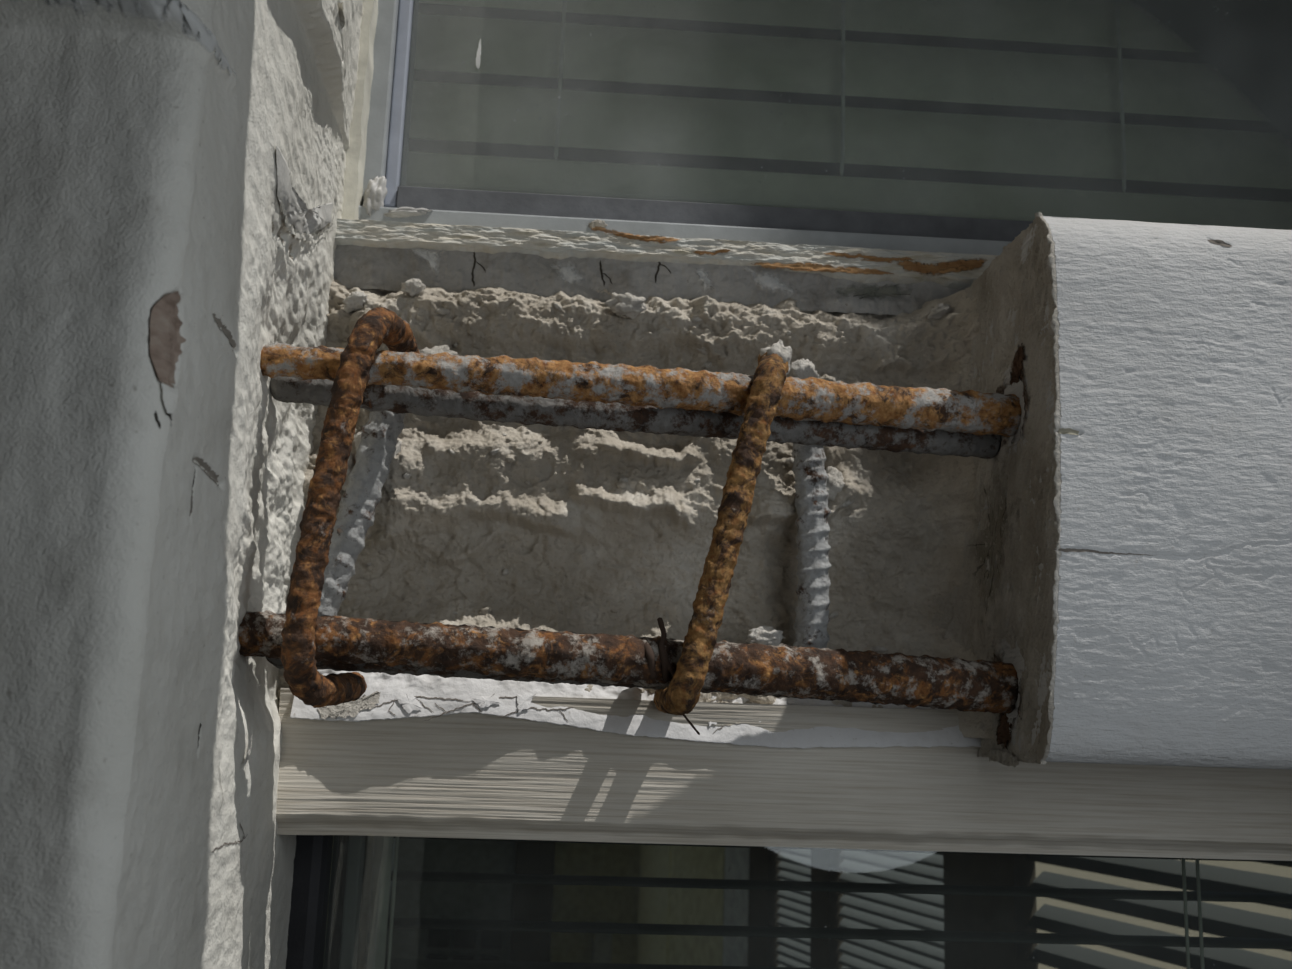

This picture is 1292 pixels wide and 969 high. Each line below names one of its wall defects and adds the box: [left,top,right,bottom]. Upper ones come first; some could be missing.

corrosion [591,226,680,244]
corrosion [754,251,986,275]
spalling [149,291,186,414]
corrosion [996,343,1029,444]
spalling [260,278,1022,739]
crack [1054,548,1152,556]
spalling [238,610,289,703]
corrosion [996,683,1021,749]